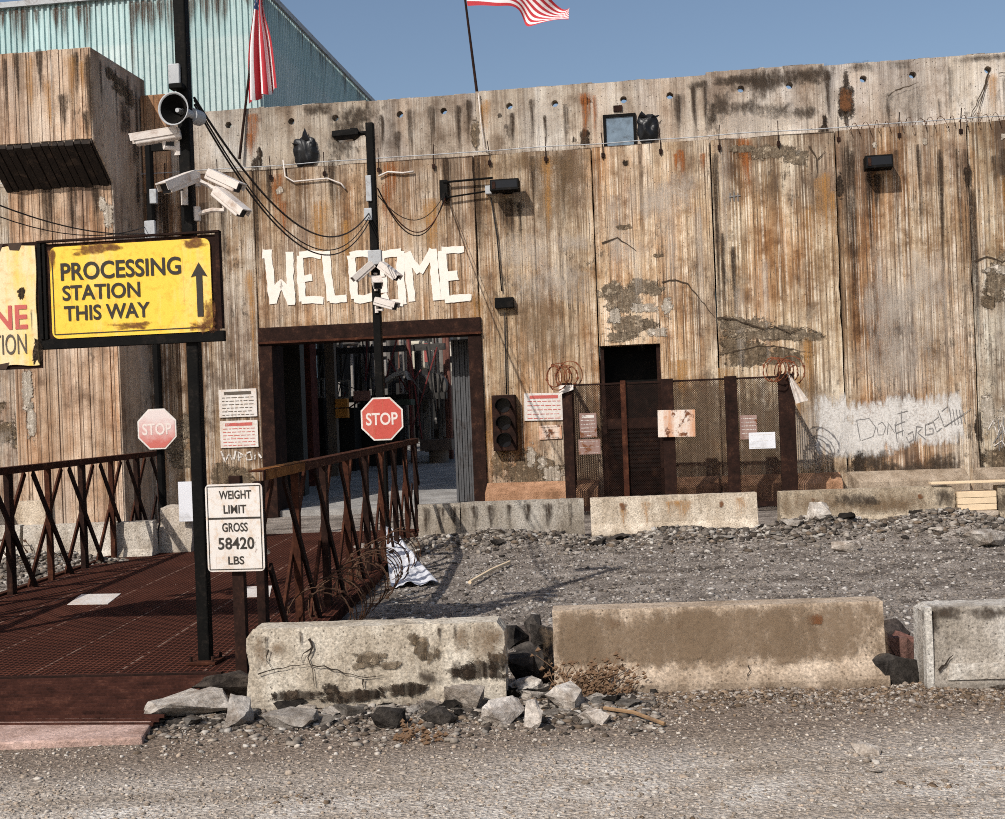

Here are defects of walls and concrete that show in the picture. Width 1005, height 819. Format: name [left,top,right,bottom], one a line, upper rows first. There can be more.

water stain [674,66,830,128]
corrosion [840,88,852,111]
spalling [595,277,673,343]
spalling [980,249,1005,310]
spalling [719,315,825,371]
spalling [0,369,37,449]
peeling [803,393,1005,472]
crack [258,638,382,688]